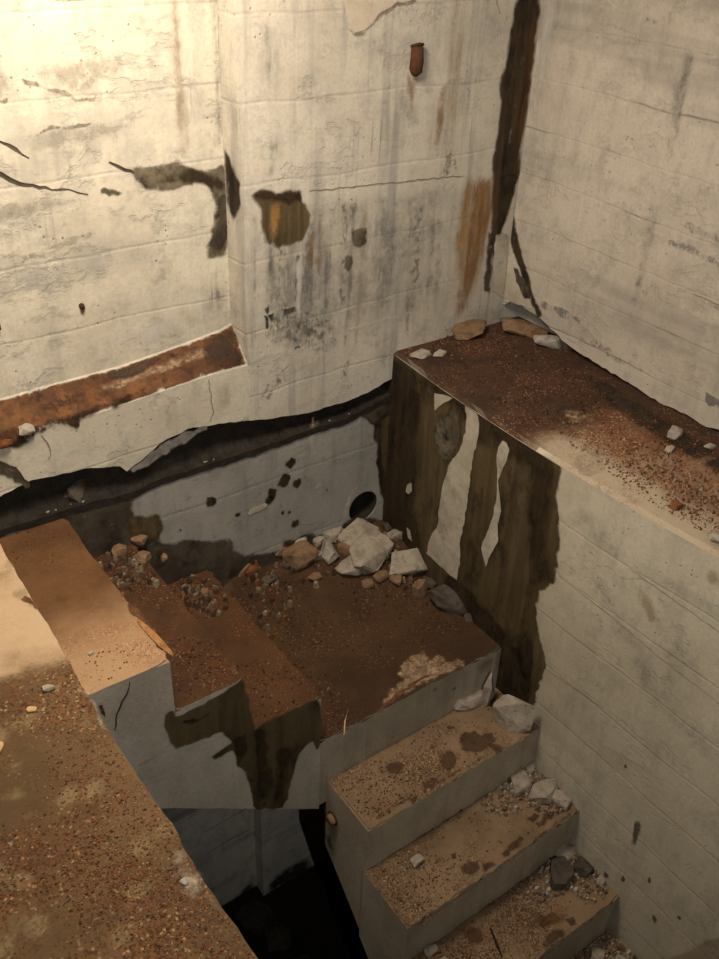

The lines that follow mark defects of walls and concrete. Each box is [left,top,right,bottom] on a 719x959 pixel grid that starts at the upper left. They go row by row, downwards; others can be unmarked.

crack [0,141,29,158]
crack [0,171,88,195]
spalling [134,152,240,258]
rust [444,181,491,295]
damp [491,0,553,255]
crack [511,218,541,318]
rust [0,326,245,449]
spalling [131,426,207,472]
peeling [705,393,719,406]
damp [33,500,323,587]
damp [342,355,561,705]
damp [165,680,323,810]